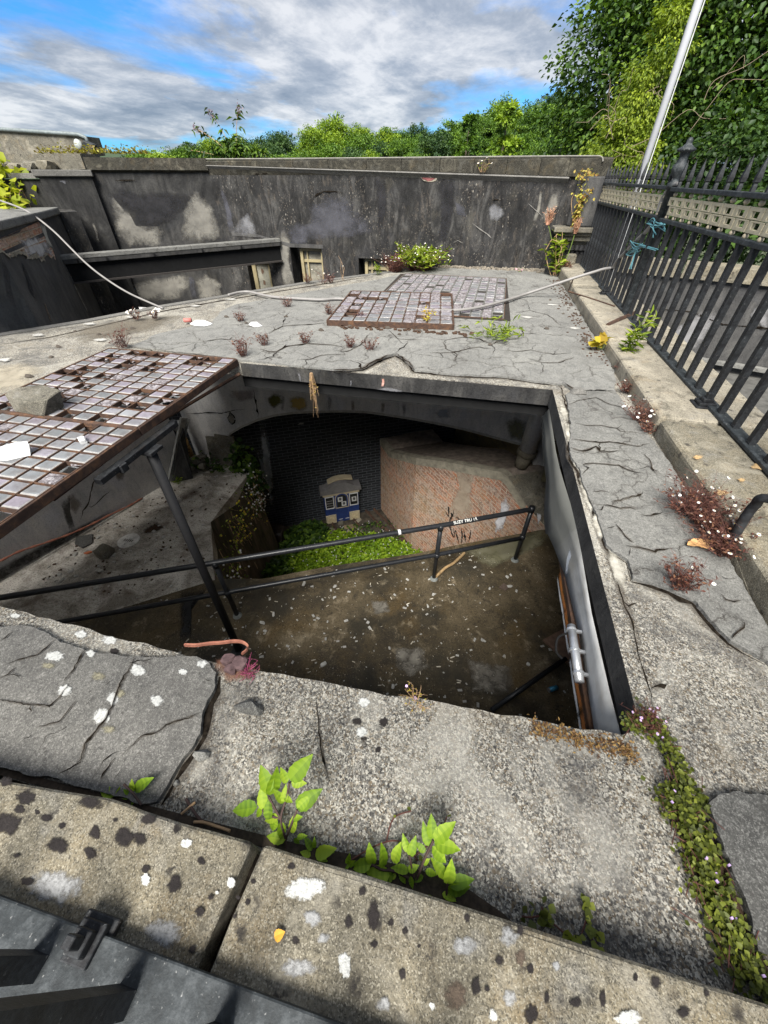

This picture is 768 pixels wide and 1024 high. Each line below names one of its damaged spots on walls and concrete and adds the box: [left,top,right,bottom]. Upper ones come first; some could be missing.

flaking render [0,222,56,262]
leakage [115,200,158,245]
leakage [184,193,253,239]
leakage [280,202,366,284]
leakage [133,276,220,300]
crack [140,305,674,555]
crack [687,570,745,638]
crack [0,631,199,780]
crack [316,701,331,784]